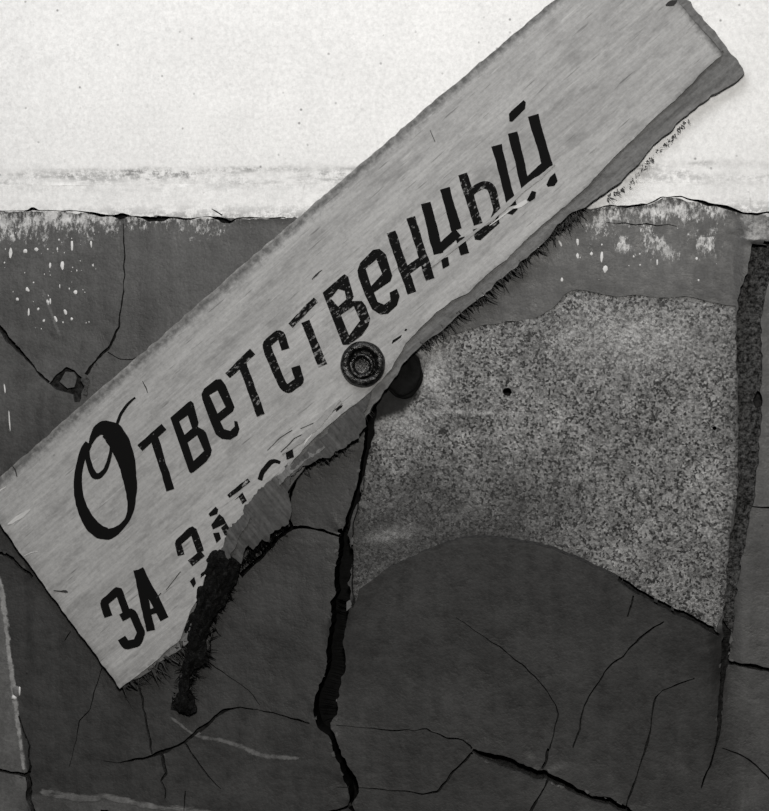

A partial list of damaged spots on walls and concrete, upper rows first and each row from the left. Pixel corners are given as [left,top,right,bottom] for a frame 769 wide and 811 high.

crack [0,325,50,383]
crack [18,207,286,376]
spalling [351,290,739,630]
crack [0,551,33,578]
crack [0,715,36,811]
crack [69,668,102,767]
crack [105,403,694,811]
crack [572,578,769,789]